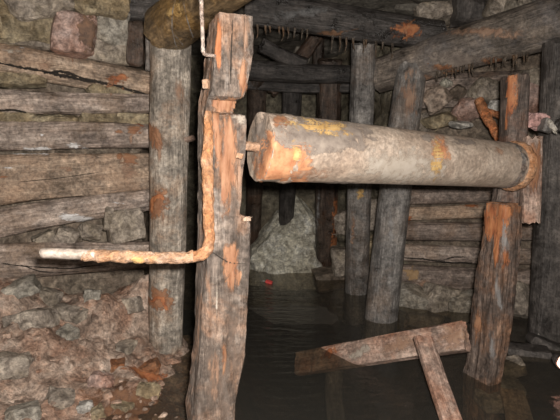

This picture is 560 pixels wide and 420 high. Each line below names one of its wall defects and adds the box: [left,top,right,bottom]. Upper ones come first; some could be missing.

crack [0,62,145,94]
rust [115,122,163,159]